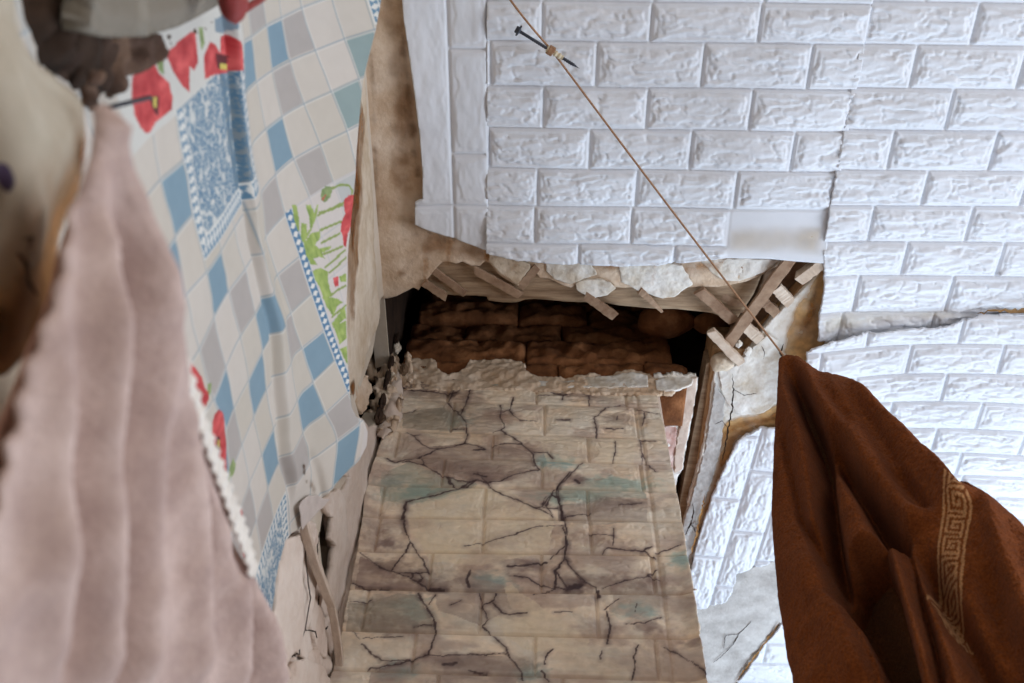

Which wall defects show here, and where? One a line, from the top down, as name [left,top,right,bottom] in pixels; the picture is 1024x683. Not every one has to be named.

flaking render [272,0,823,683]
crack [716,374,756,466]